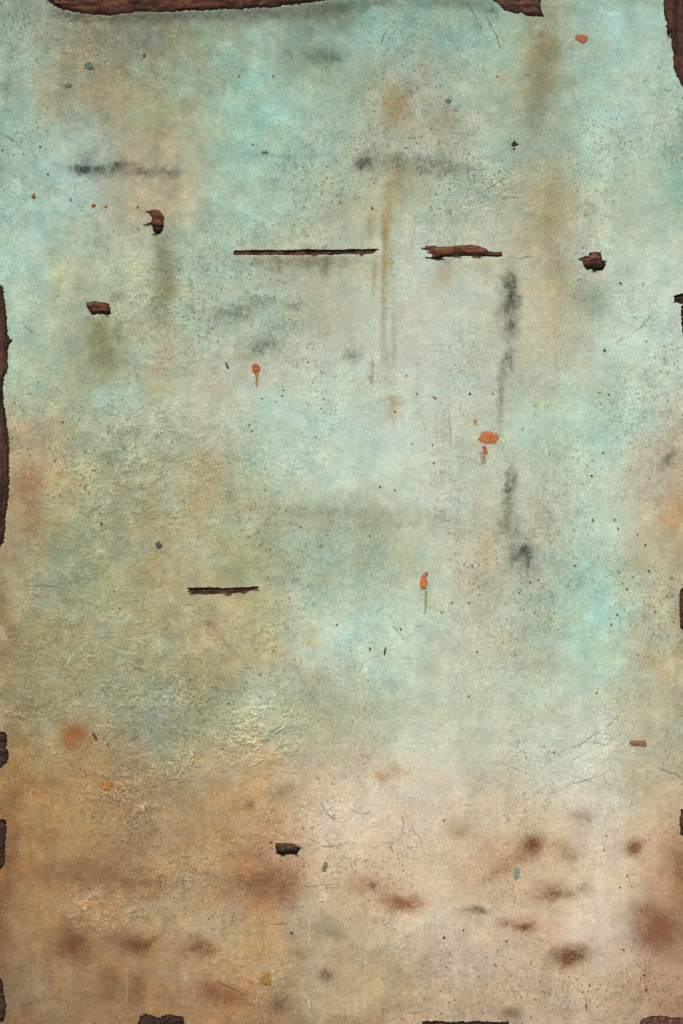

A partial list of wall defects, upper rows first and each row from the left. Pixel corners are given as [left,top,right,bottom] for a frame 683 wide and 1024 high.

spalling [47,0,328,16]
spalling [493,0,544,17]
spalling [663,0,683,87]
spalling [137,206,165,235]
spalling [422,245,502,260]
spalling [578,252,606,272]
spalling [86,301,111,315]
damp [504,275,516,330]
spalling [0,285,13,546]
corrosion [473,419,499,465]
corrosion [420,572,428,613]
spalling [270,841,305,867]